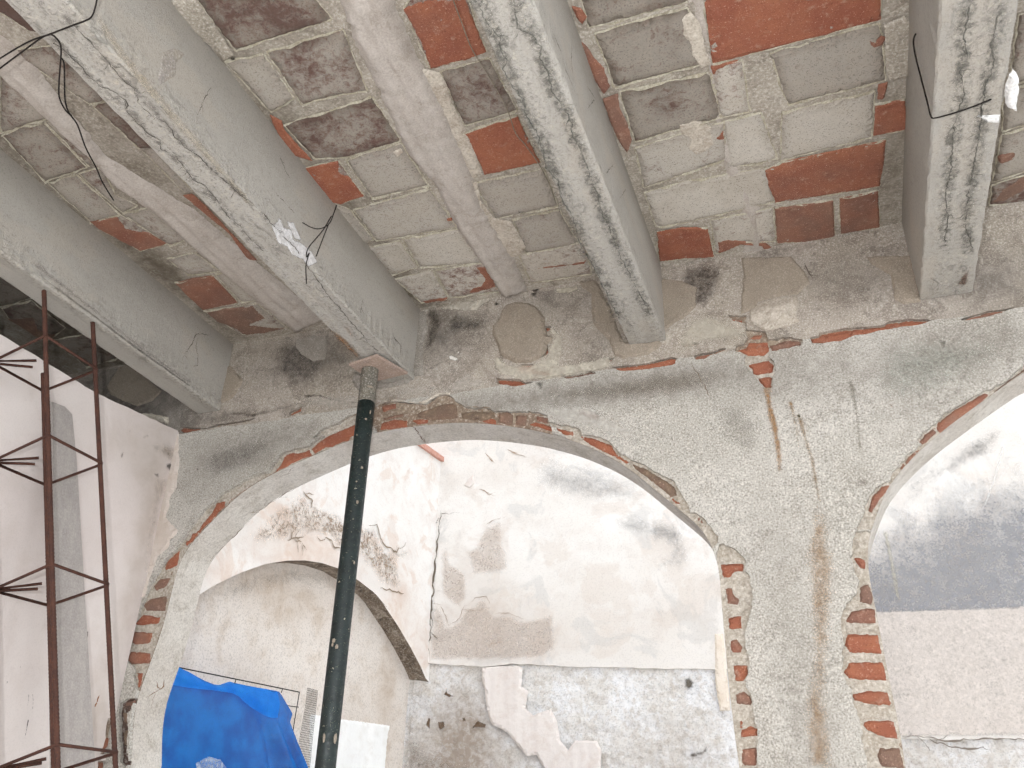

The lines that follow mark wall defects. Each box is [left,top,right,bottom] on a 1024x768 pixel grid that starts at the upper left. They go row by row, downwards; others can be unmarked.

crack [53,26,401,352]
flaking render [607,358,676,371]
rust [765,389,780,468]
flaking render [686,321,926,388]
flaking render [90,322,356,768]
flaking render [359,524,406,594]
crack [428,512,458,654]
flaking render [373,396,759,768]
flaking render [841,367,1024,768]